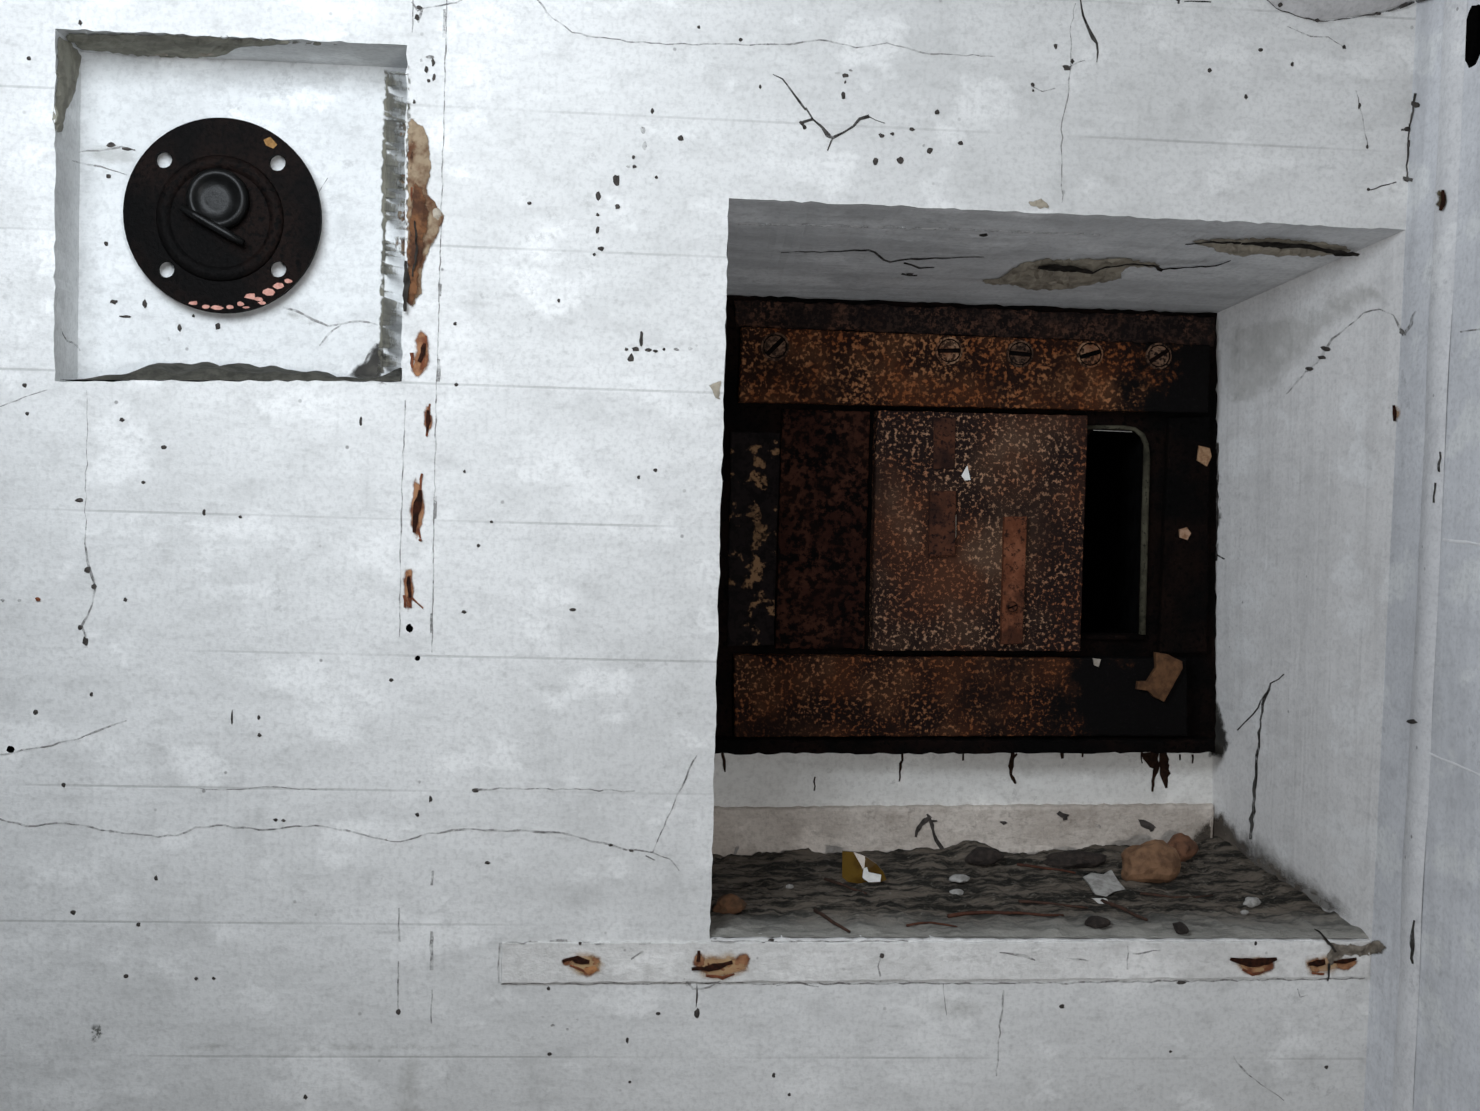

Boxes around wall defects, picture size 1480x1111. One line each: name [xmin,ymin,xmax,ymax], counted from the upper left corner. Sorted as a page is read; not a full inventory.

crack [539,2,979,151]
crack [1031,0,1099,200]
spalling [983,238,1360,291]
rust [410,331,429,376]
rust [1197,446,1212,466]
rust [410,473,425,542]
rust [1179,527,1191,540]
rust [403,569,423,608]
crack [0,757,696,860]
spalling [1314,928,1386,981]